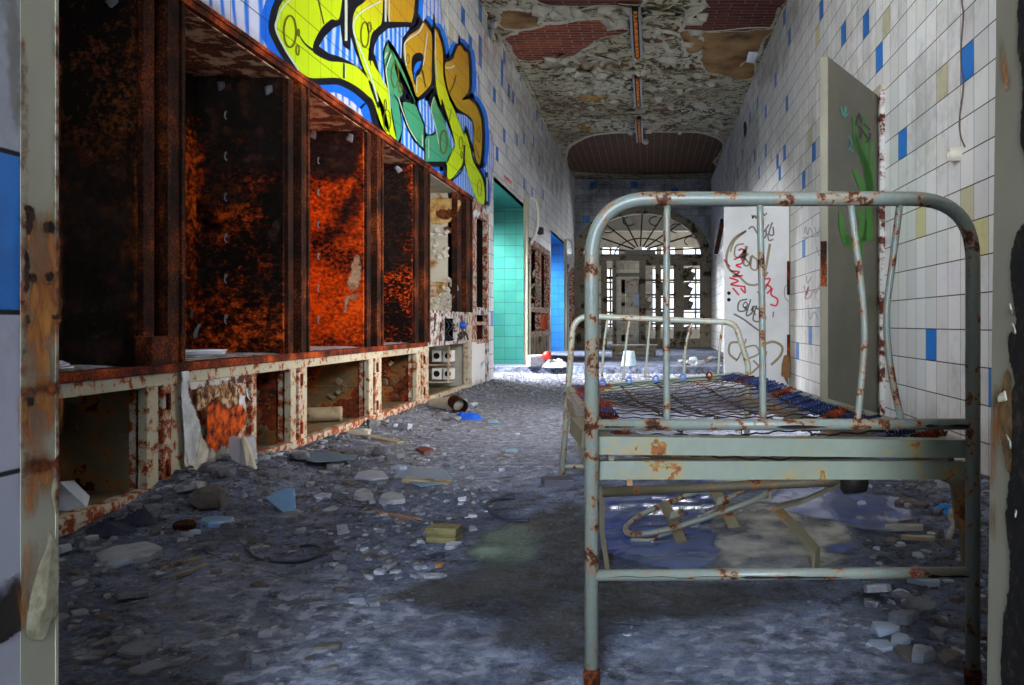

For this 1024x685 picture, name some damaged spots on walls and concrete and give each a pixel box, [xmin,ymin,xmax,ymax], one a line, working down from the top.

spalling [487,0,787,175]
rust [19,207,428,512]